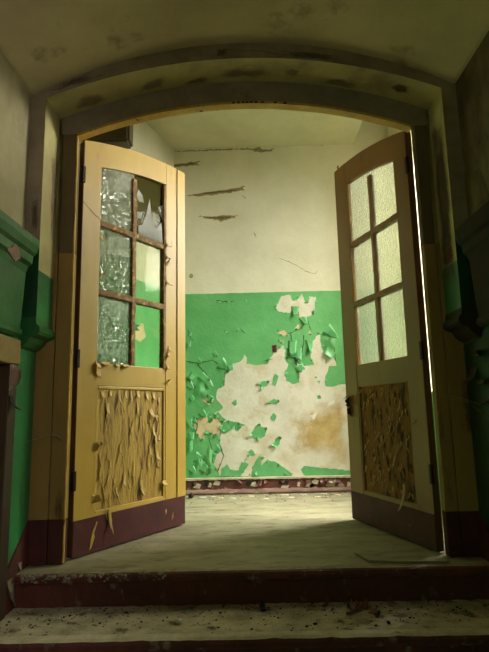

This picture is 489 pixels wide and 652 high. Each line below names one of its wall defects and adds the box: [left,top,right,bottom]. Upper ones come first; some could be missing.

spalling [188,186,245,196]
peeling [186,294,416,512]
damp [287,393,349,466]